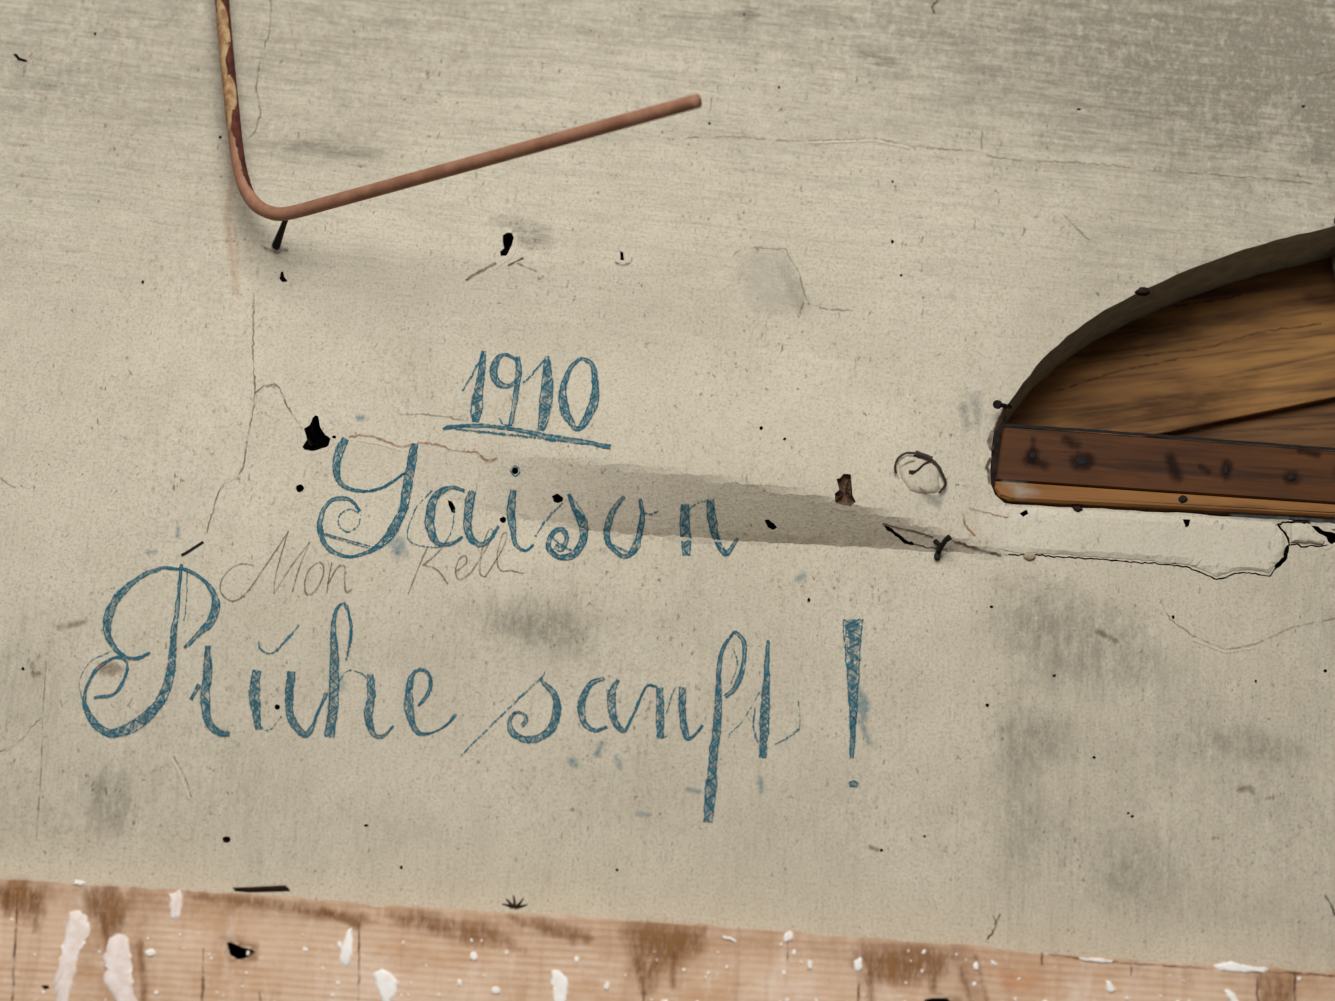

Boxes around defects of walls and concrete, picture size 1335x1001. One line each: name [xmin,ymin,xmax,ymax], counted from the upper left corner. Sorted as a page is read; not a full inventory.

crack [882,410,1335,580]
leakage [634,925,698,983]
leakage [865,950,943,988]